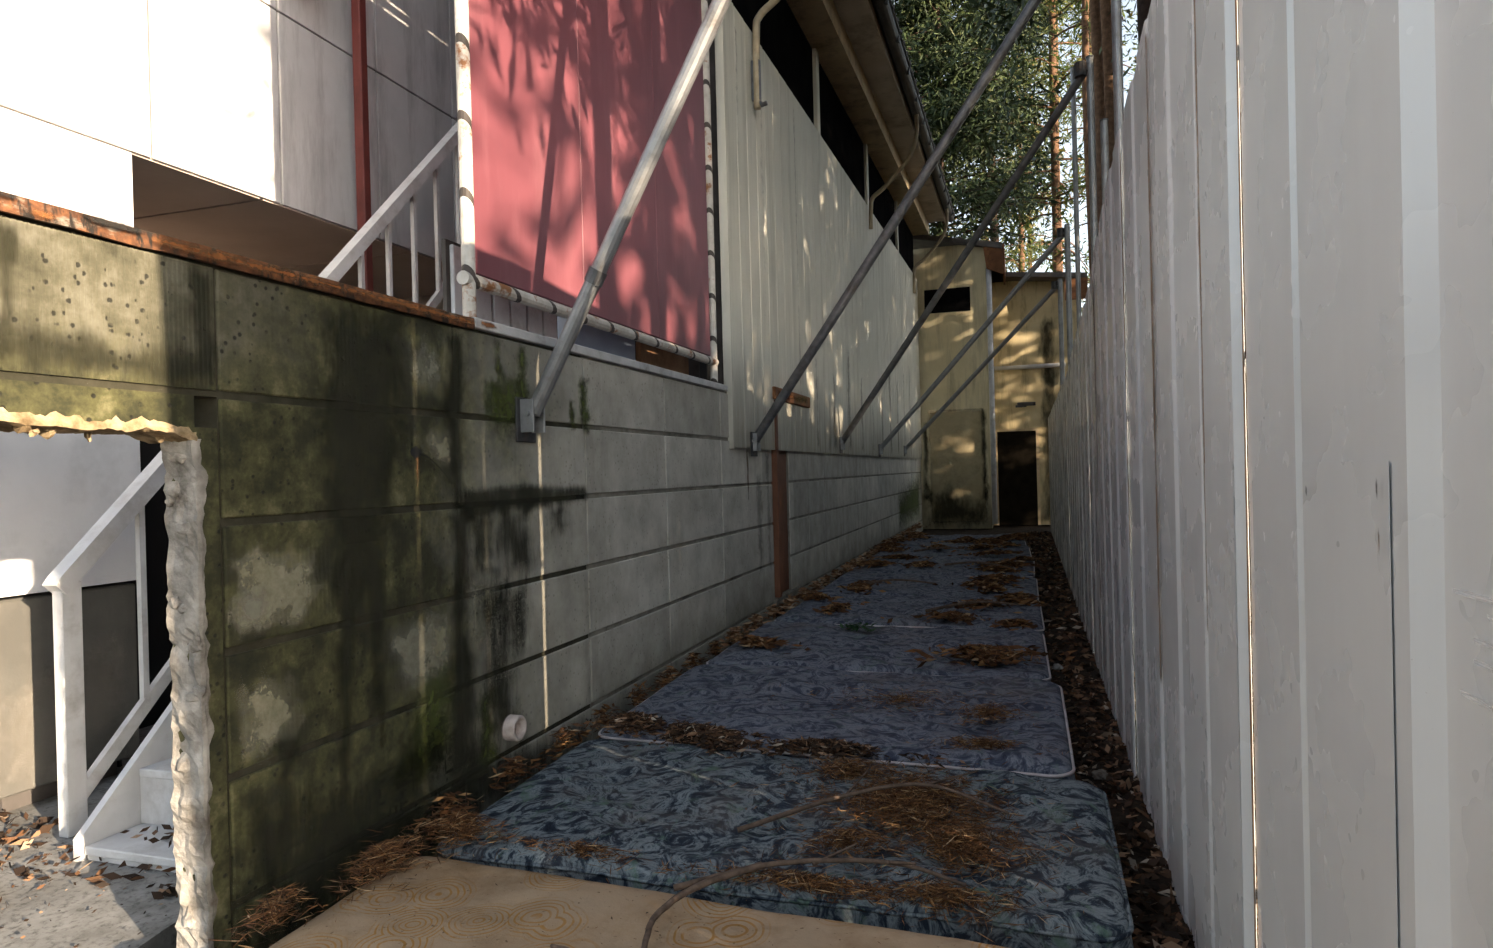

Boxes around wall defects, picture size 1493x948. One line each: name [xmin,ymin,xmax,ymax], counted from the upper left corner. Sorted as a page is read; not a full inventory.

corrosion [153,239,496,328]
peeling [231,549,318,628]
damp [258,316,590,945]
spalling [0,407,218,948]
peeling [241,683,294,750]